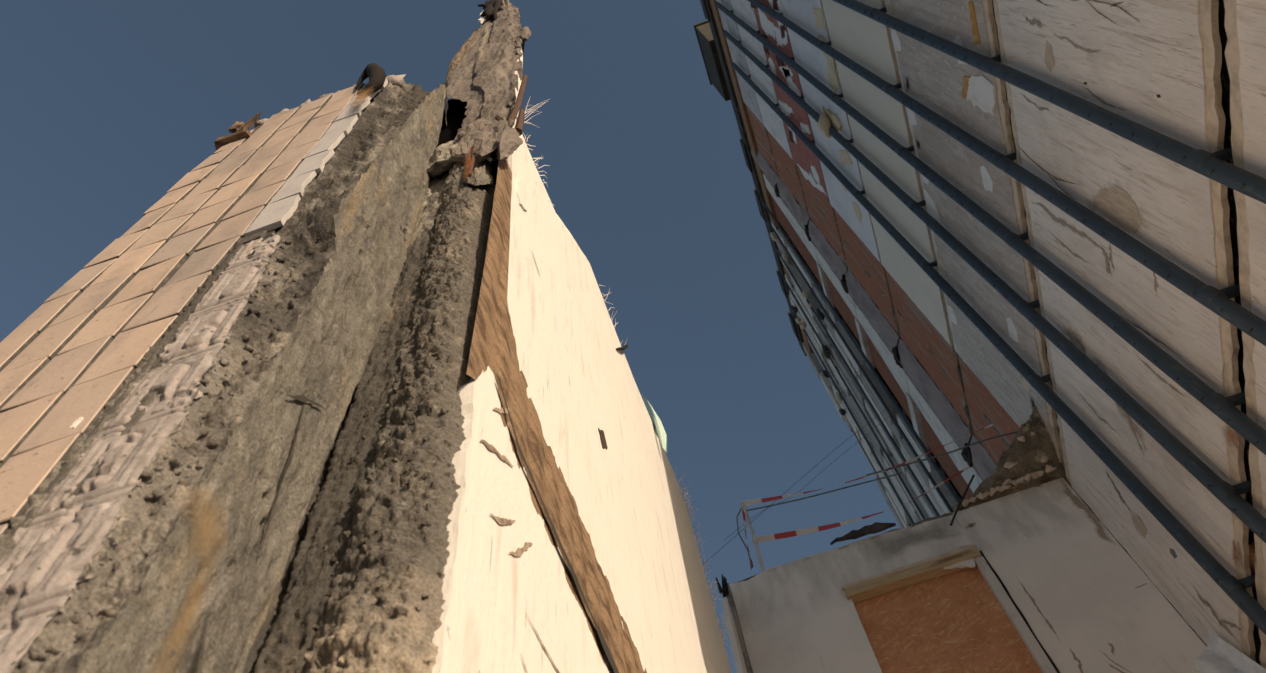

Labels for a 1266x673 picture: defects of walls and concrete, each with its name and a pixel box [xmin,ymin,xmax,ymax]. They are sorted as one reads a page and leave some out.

peeling [750,0,853,166]
peeling [515,178,527,212]
peeling [797,164,827,196]
spalling [10,74,431,673]